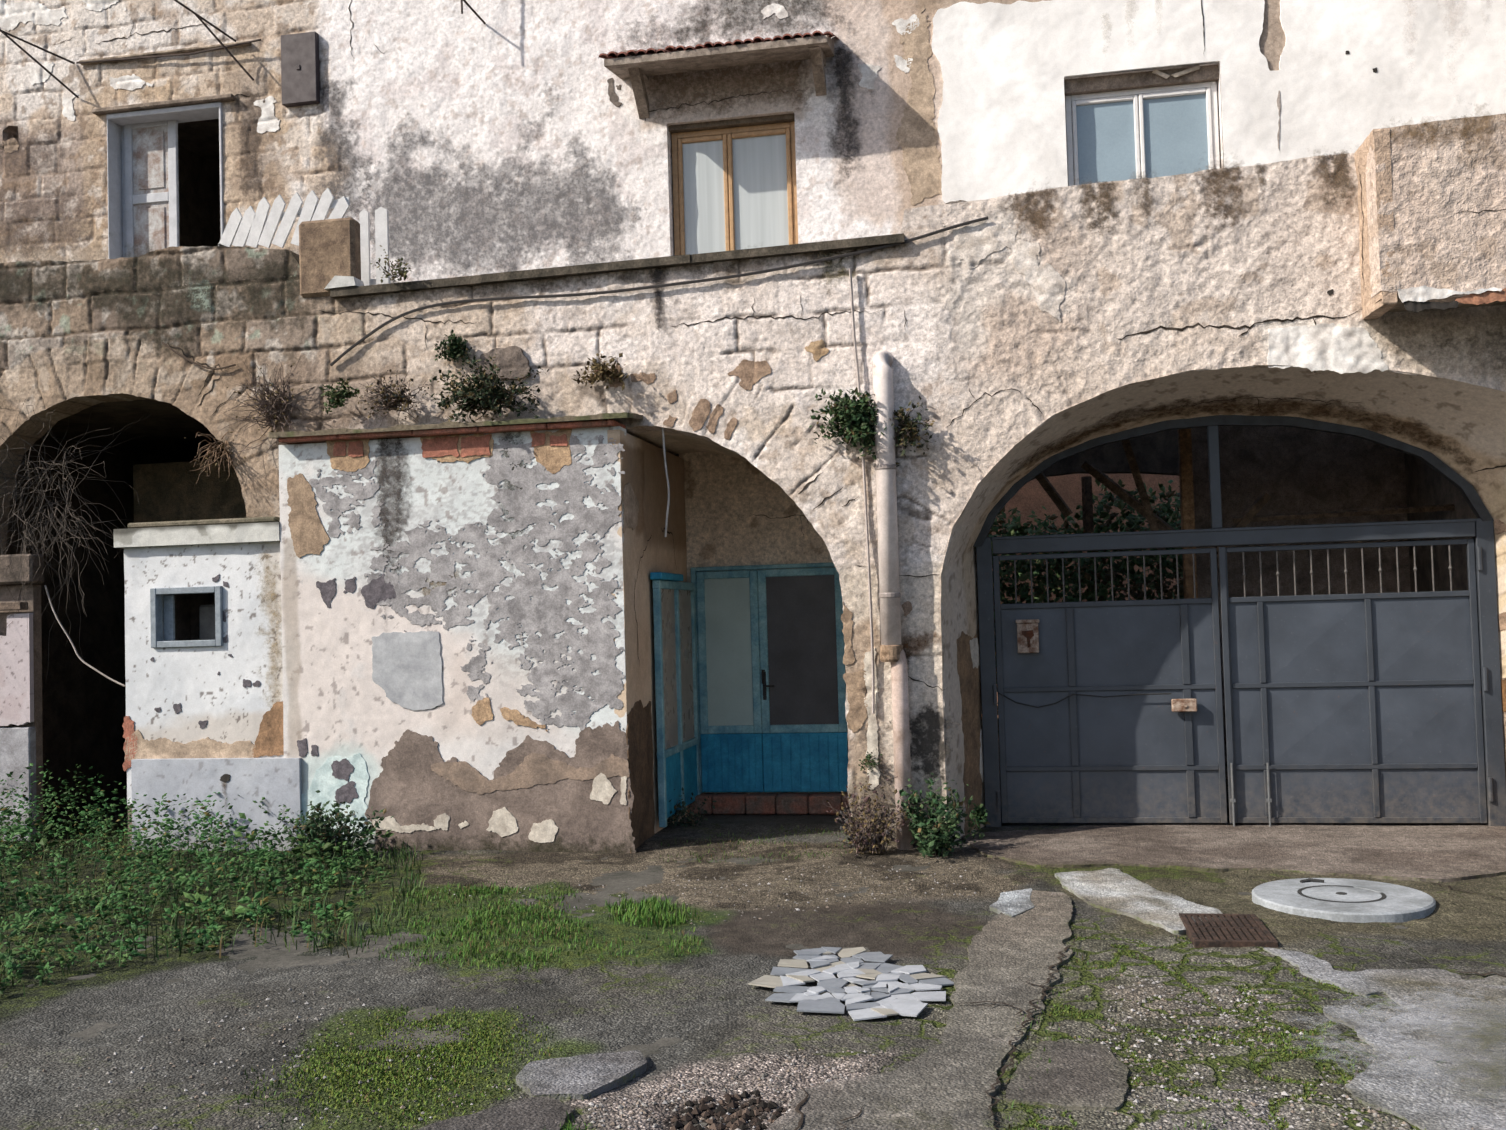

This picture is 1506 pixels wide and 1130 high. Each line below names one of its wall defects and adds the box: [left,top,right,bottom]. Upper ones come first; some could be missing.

damp [830,48,860,171]
damp [320,81,665,328]
damp [1082,183,1115,220]
damp [1204,164,1243,215]
damp [1319,153,1349,187]
damp [685,247,873,278]
crack [1117,166,1364,340]
spalling [607,363,656,387]
spalling [728,359,771,390]
spalling [663,389,738,440]
peeling [122,429,655,854]
flaking render [957,631,984,835]